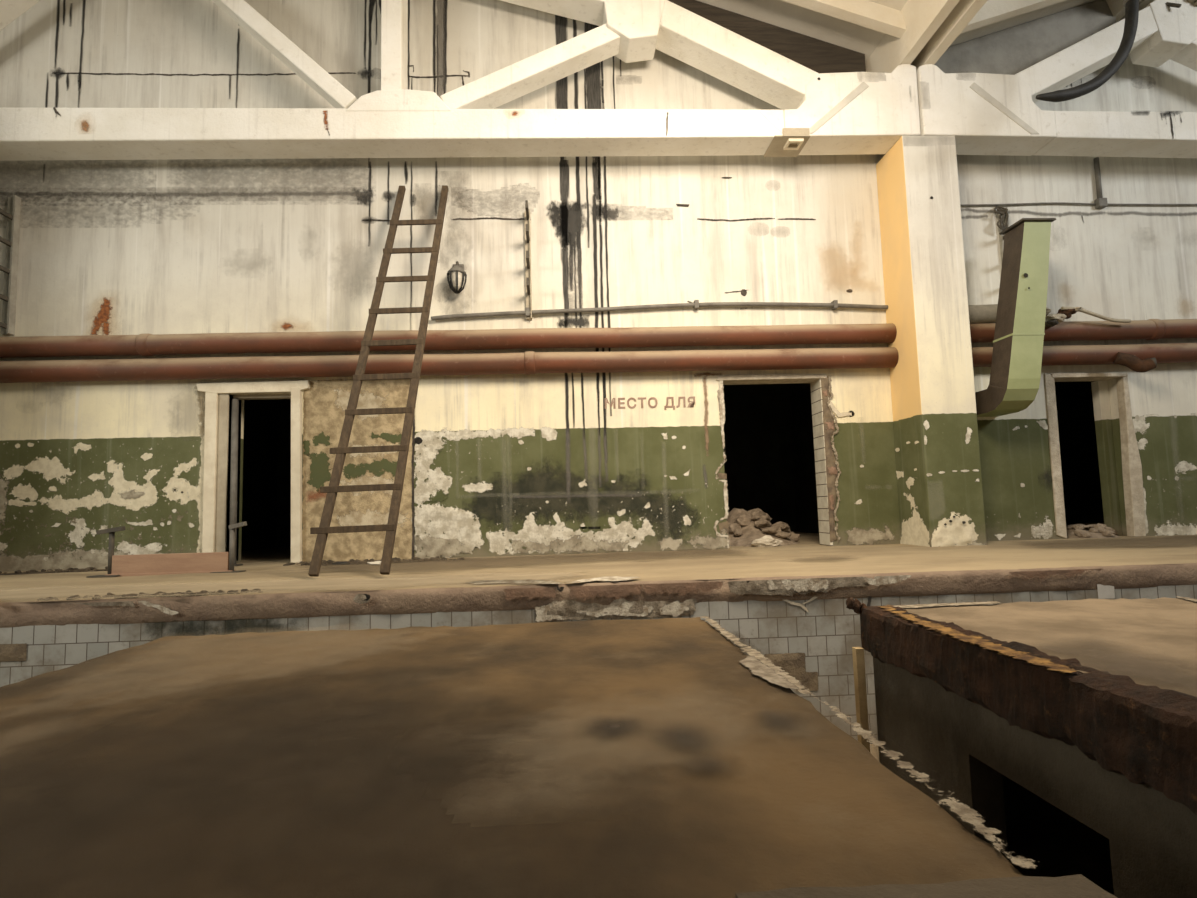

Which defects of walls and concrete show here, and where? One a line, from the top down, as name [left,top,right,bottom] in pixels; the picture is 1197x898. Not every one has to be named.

water stain [555,15,599,45]
water stain [555,56,621,109]
rust [92,298,113,335]
water stain [547,156,619,328]
flaking render [0,387,205,572]
flaking render [302,379,730,562]
spalling [821,376,1053,547]
peeling [1143,476,1197,536]
peeling [1175,460,1197,481]
water stain [147,618,293,636]
spalling [467,575,1036,869]
rust [860,606,1197,815]